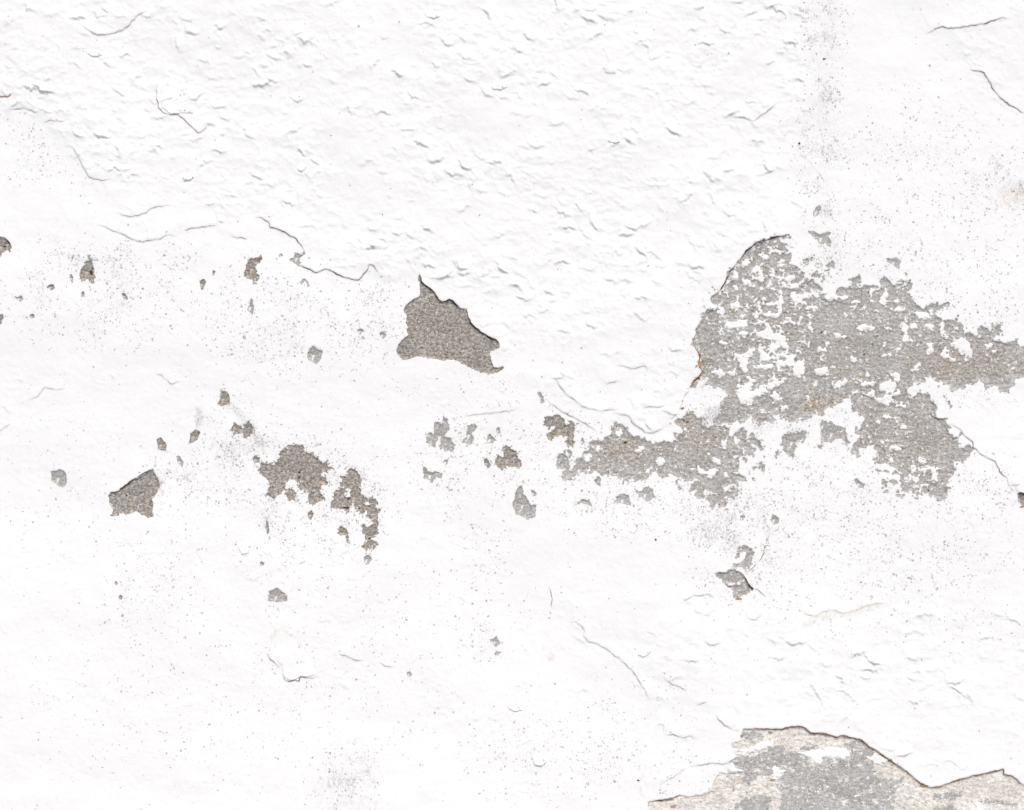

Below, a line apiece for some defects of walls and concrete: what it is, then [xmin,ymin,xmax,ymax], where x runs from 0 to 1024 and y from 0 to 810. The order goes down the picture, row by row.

crack [260,217,376,280]
peeling [808,230,832,247]
flaking render [396,272,504,375]
flaking render [543,234,1024,520]
peeling [422,416,477,483]
peeling [484,427,522,470]
flaking render [108,469,160,518]
flaking render [253,443,381,564]
peeling [512,486,537,519]
flaking render [715,545,755,600]
flaking render [648,726,1024,810]